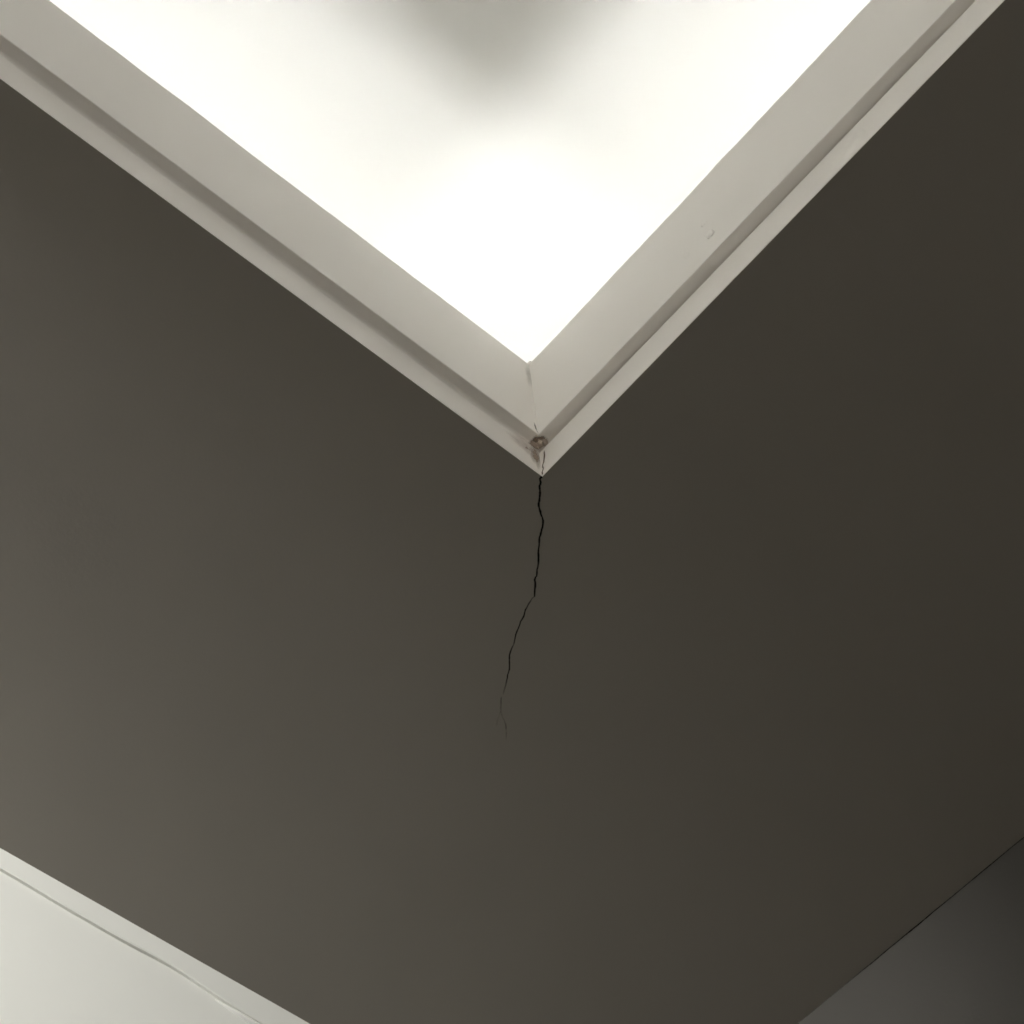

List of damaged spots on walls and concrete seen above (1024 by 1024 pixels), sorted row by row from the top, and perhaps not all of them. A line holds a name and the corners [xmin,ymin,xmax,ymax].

crack [505,424,545,687]